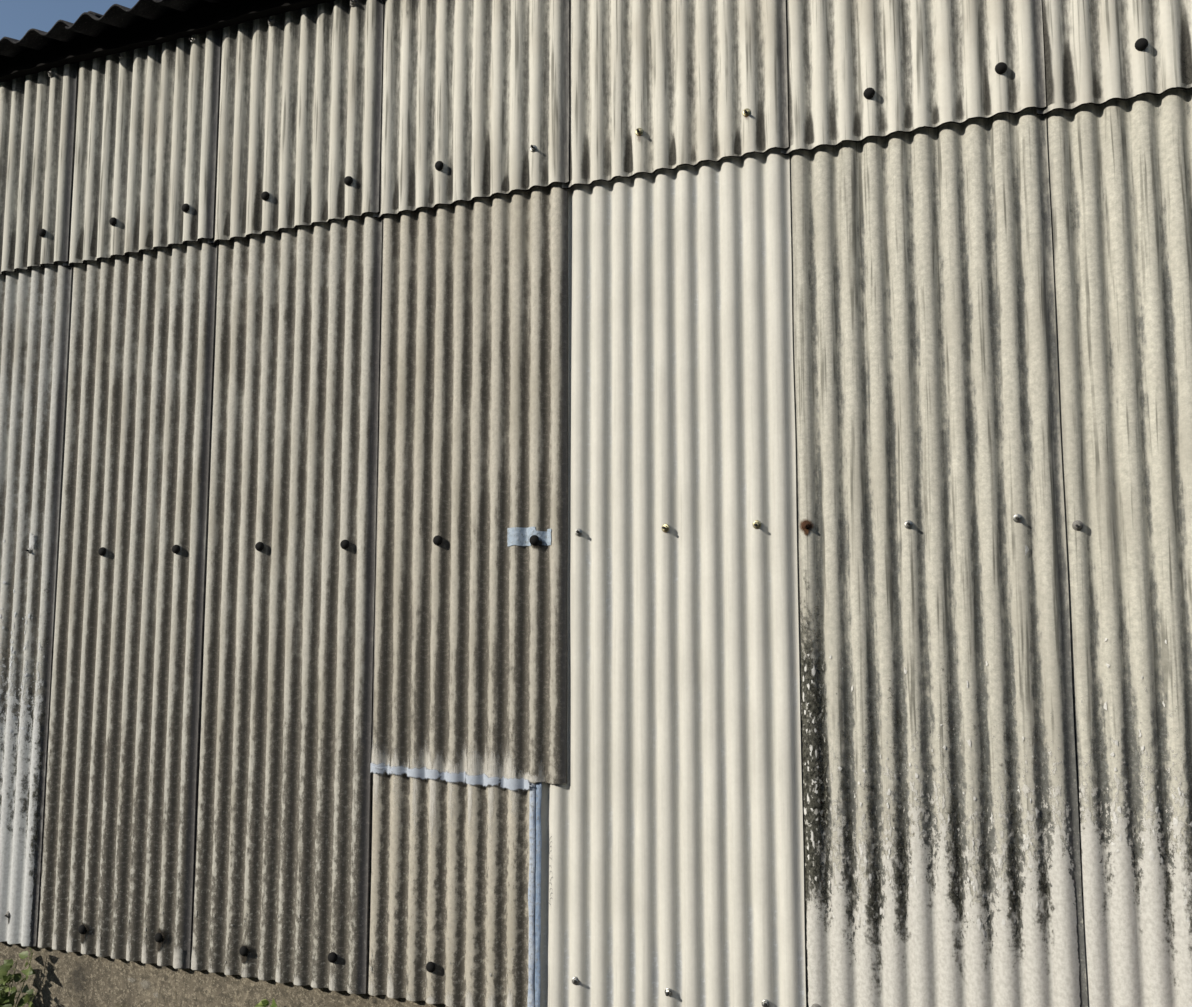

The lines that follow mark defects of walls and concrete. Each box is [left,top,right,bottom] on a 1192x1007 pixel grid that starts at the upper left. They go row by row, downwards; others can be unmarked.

damp [816,614,911,986]
damp [931,768,993,971]
damp [1001,759,1023,956]
damp [1035,811,1054,943]
damp [1161,833,1174,955]
damp [1184,819,1192,875]